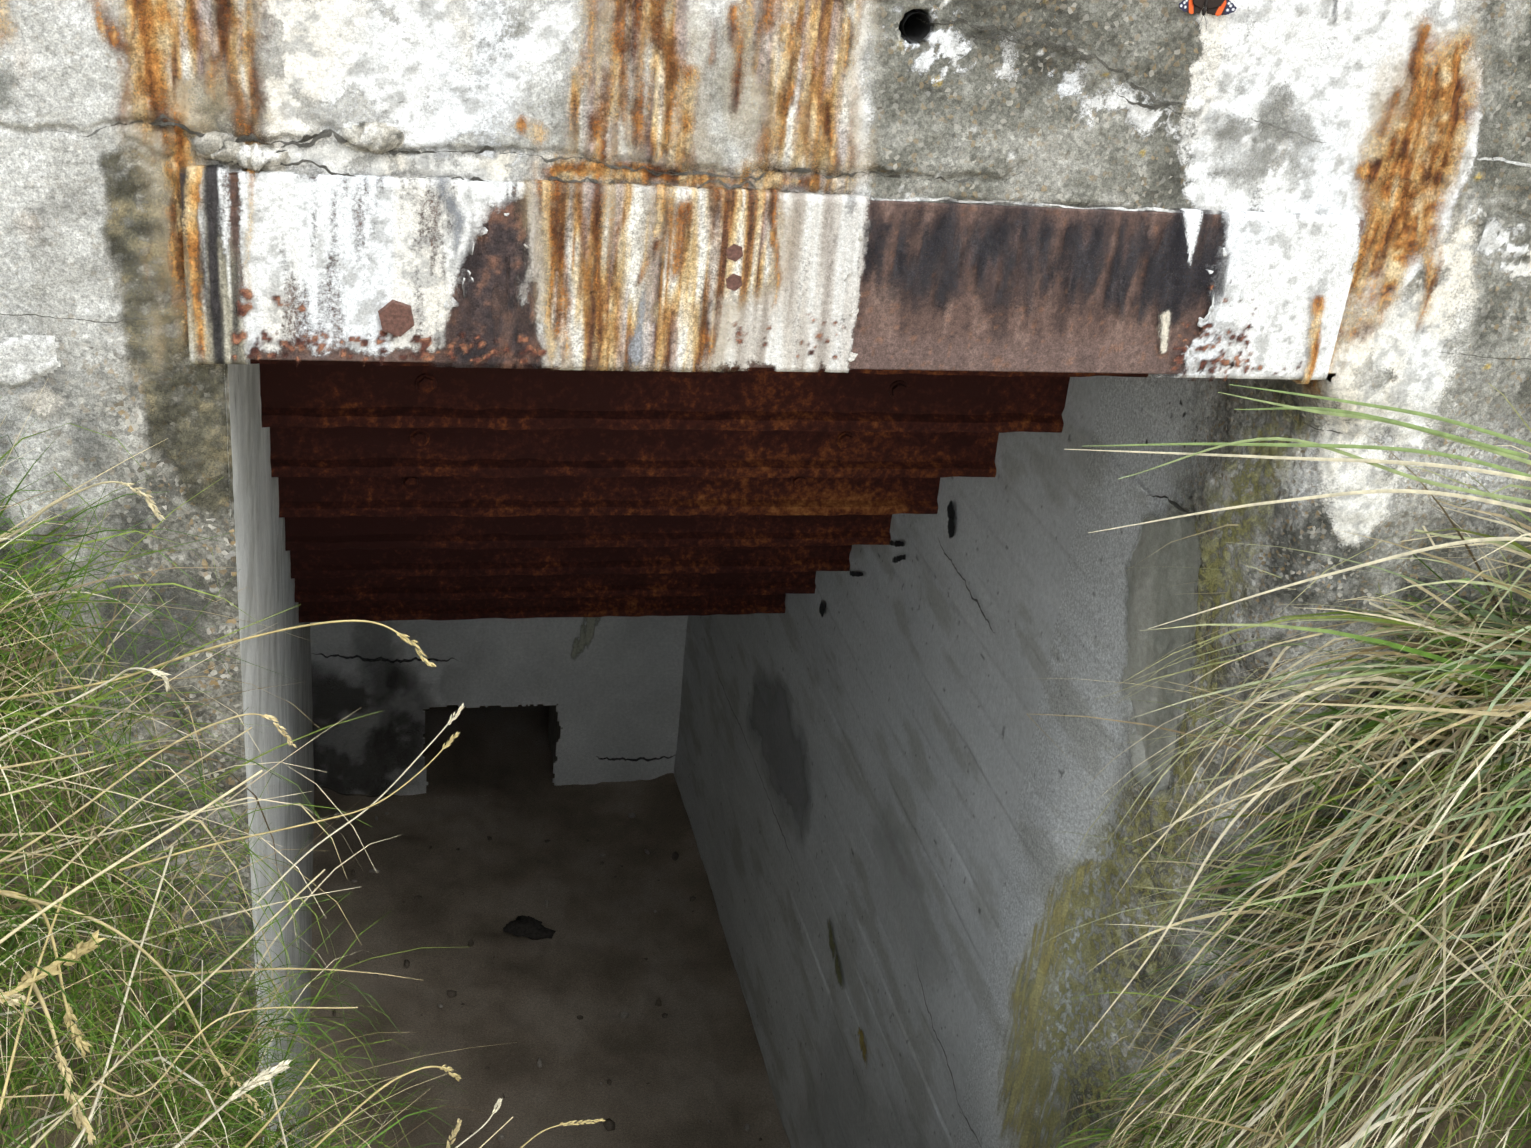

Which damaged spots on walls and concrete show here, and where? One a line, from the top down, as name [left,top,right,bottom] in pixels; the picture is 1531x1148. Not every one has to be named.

water stain [99,146,233,515]
crack [51,113,354,176]
peeling [238,0,619,369]
corrosion [94,0,860,372]
peeling [636,185,683,289]
crack [389,145,1014,194]
peeling [697,191,871,373]
corrosion [1171,21,1476,393]